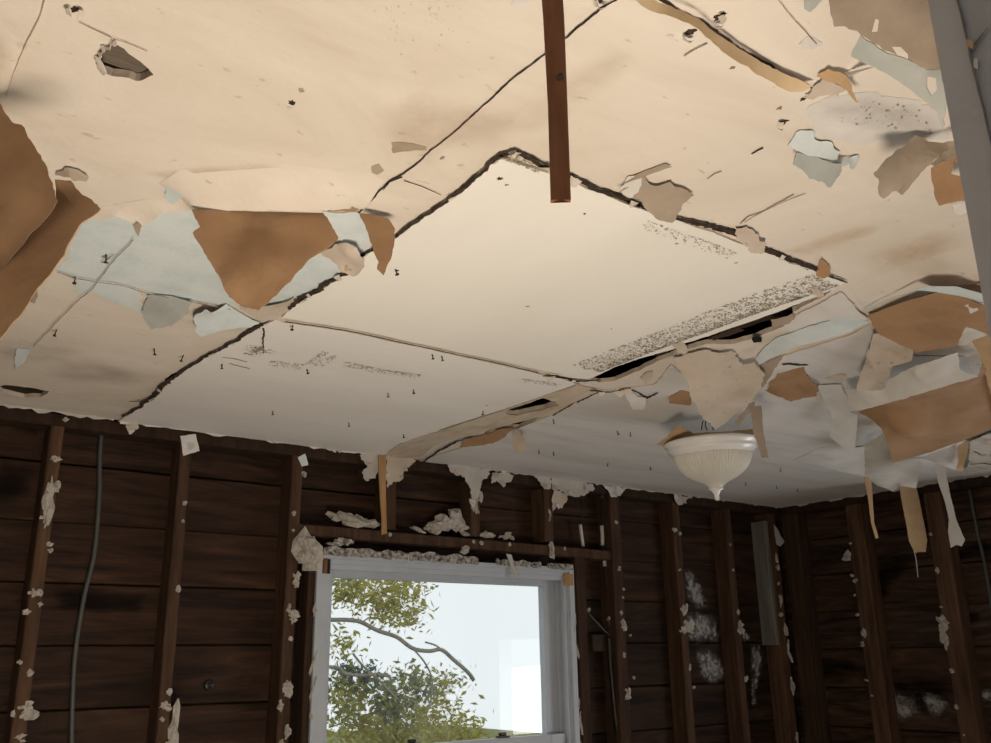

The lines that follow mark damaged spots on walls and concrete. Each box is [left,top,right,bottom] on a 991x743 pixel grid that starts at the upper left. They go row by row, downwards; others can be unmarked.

crack [79,22,147,51]
crack [565,0,616,39]
crack [659,0,817,89]
crack [358,53,648,238]
peeling [800,68,950,145]
crack [33,239,230,347]
peeling [55,210,249,315]
peeling [264,252,341,306]
peeling [322,211,372,255]
crack [121,248,657,417]
crack [676,193,848,283]
spalling [387,384,596,458]